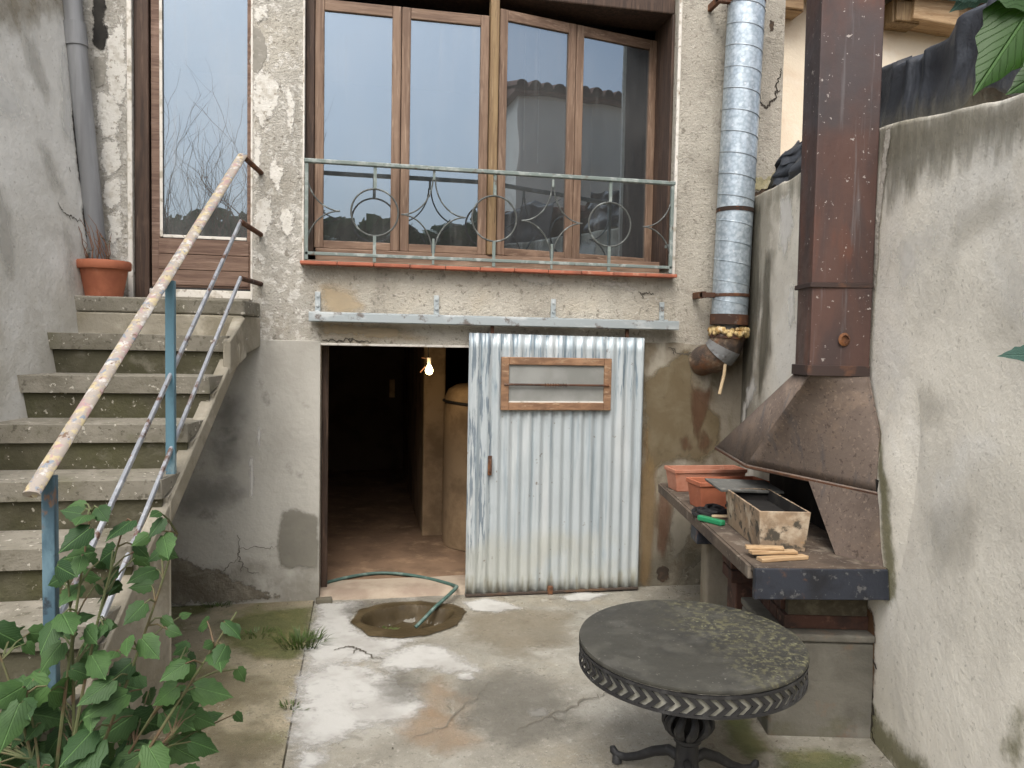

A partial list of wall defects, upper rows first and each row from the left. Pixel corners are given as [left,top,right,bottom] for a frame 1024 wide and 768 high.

peeling [93,15,127,245]
peeling [249,4,296,238]
crack [760,68,782,109]
leakage [886,93,1024,193]
leakage [638,209,770,587]
crack [208,535,277,574]
leakage [563,592,606,601]
leakage [288,598,519,768]